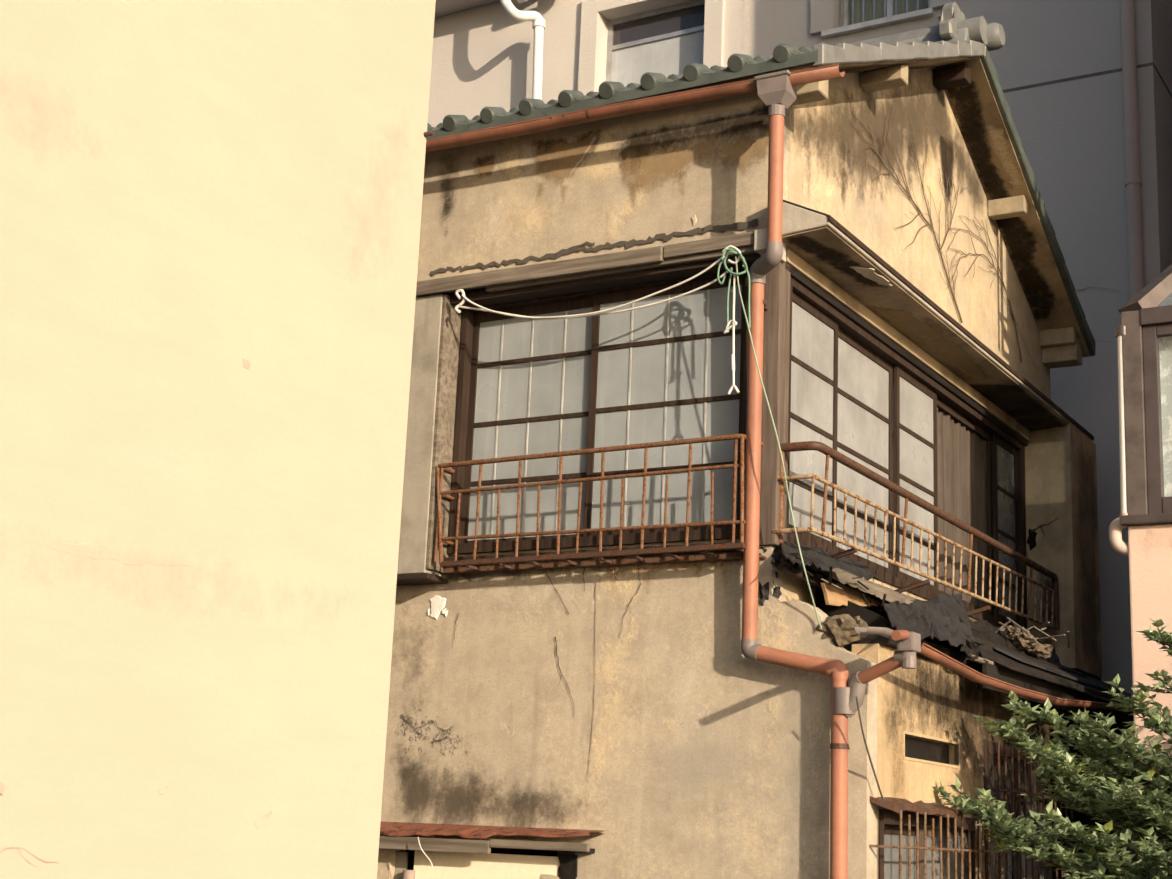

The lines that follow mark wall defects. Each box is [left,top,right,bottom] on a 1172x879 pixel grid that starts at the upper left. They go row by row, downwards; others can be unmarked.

water stain [534,131,600,195]
water stain [622,133,768,197]
spalling [1027,529,1037,551]
peeling [427,595,448,620]
crack [545,568,585,717]
water stain [401,764,558,826]